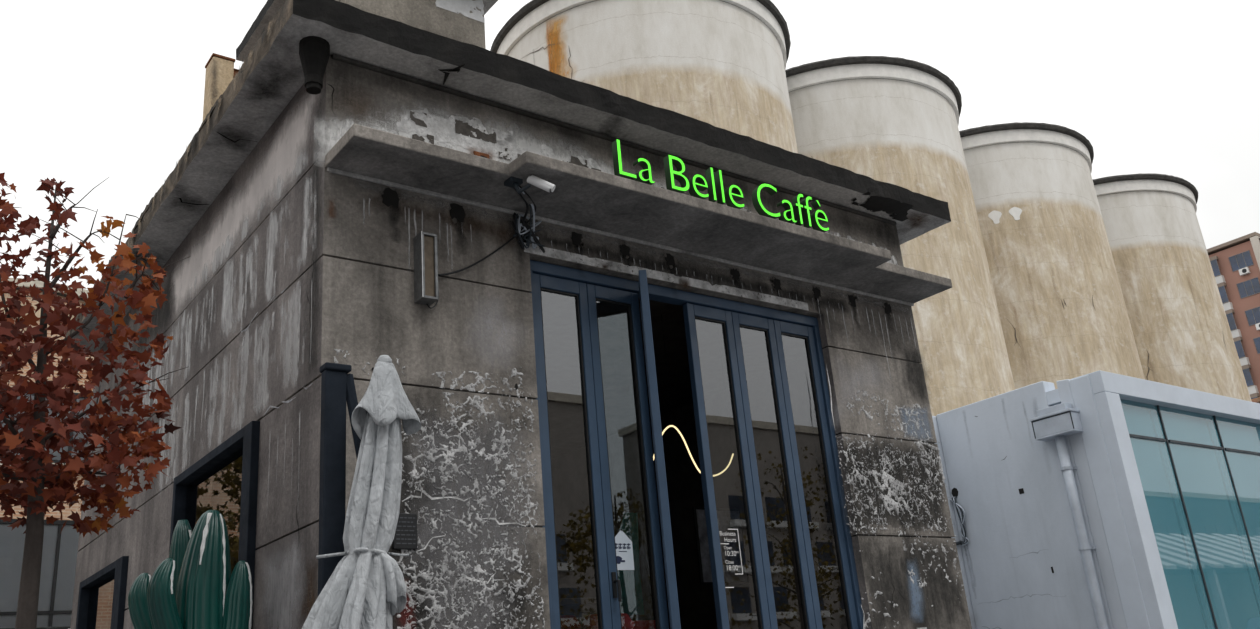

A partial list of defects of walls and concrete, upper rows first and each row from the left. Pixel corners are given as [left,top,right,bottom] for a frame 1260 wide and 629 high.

peeling [435,0,485,23]
peeling [372,108,607,173]
corrosion [549,20,564,72]
damp [135,115,321,482]
damp [389,403,527,629]
damp [545,238,965,629]